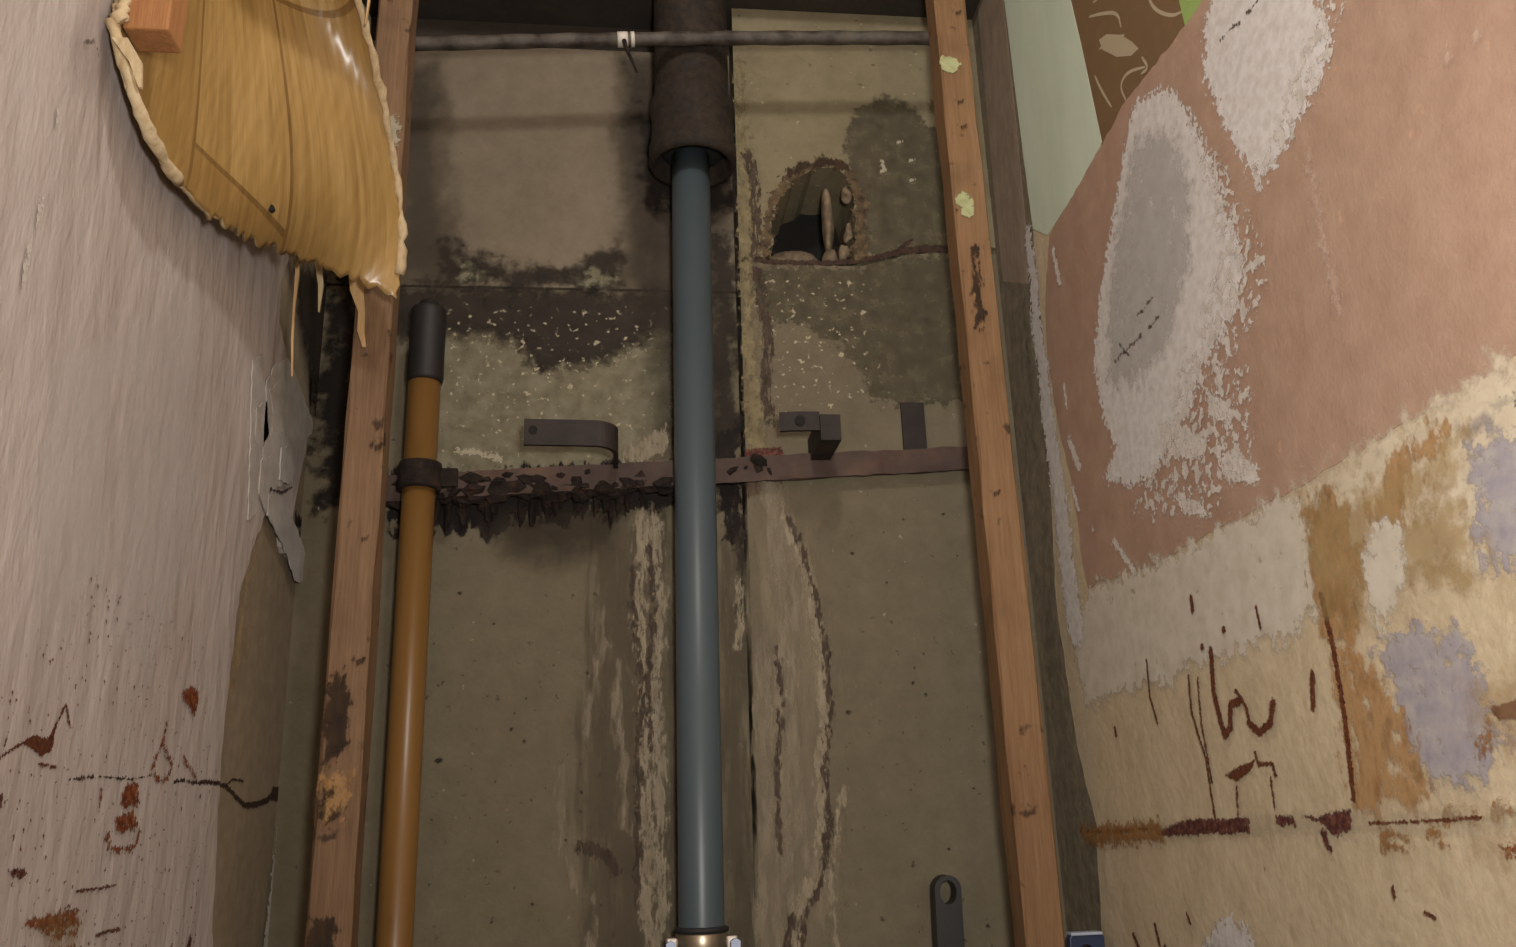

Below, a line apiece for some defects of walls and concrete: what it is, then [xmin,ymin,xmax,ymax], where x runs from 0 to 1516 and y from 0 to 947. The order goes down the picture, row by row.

spalling [756,154,872,266]
spalling [1092,0,1346,524]
spalling [1024,225,1085,655]
corrosion [434,469,675,537]
spalling [1111,537,1136,577]
corrosion [0,575,210,947]
crack [69,773,279,809]
leakage [552,507,678,947]
leakage [721,480,849,947]
crack [1369,815,1482,826]
corrosion [1475,700,1516,760]
spalling [1202,905,1256,947]